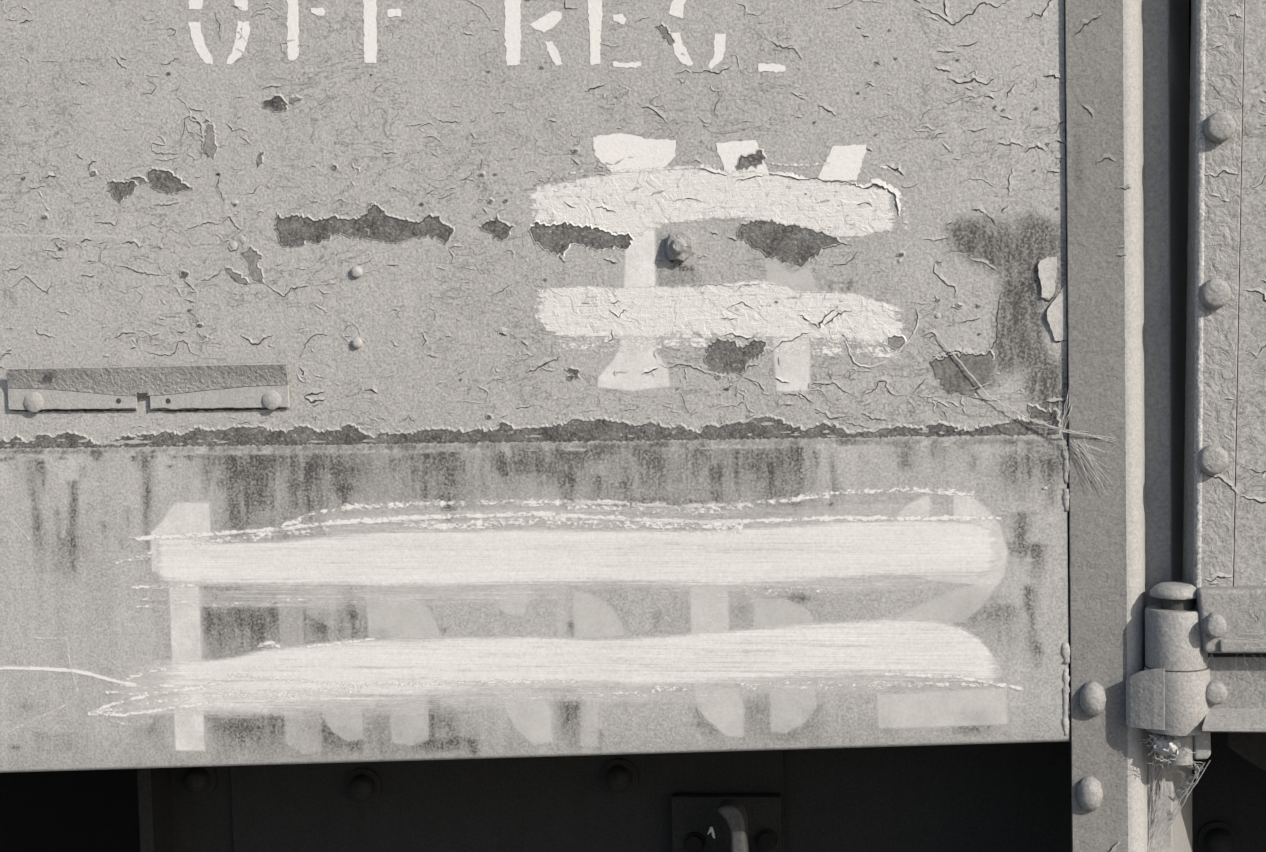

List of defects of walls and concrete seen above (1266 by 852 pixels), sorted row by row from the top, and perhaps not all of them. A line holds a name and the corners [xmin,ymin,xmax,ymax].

peeling [89,166,194,204]
crack [1096,154,1131,190]
peeling [274,201,455,248]
crack [0,0,1102,444]
peeling [479,198,634,257]
peeling [736,218,842,267]
peeling [703,337,768,391]
peeling [930,349,995,396]
peeling [1027,403,1061,427]